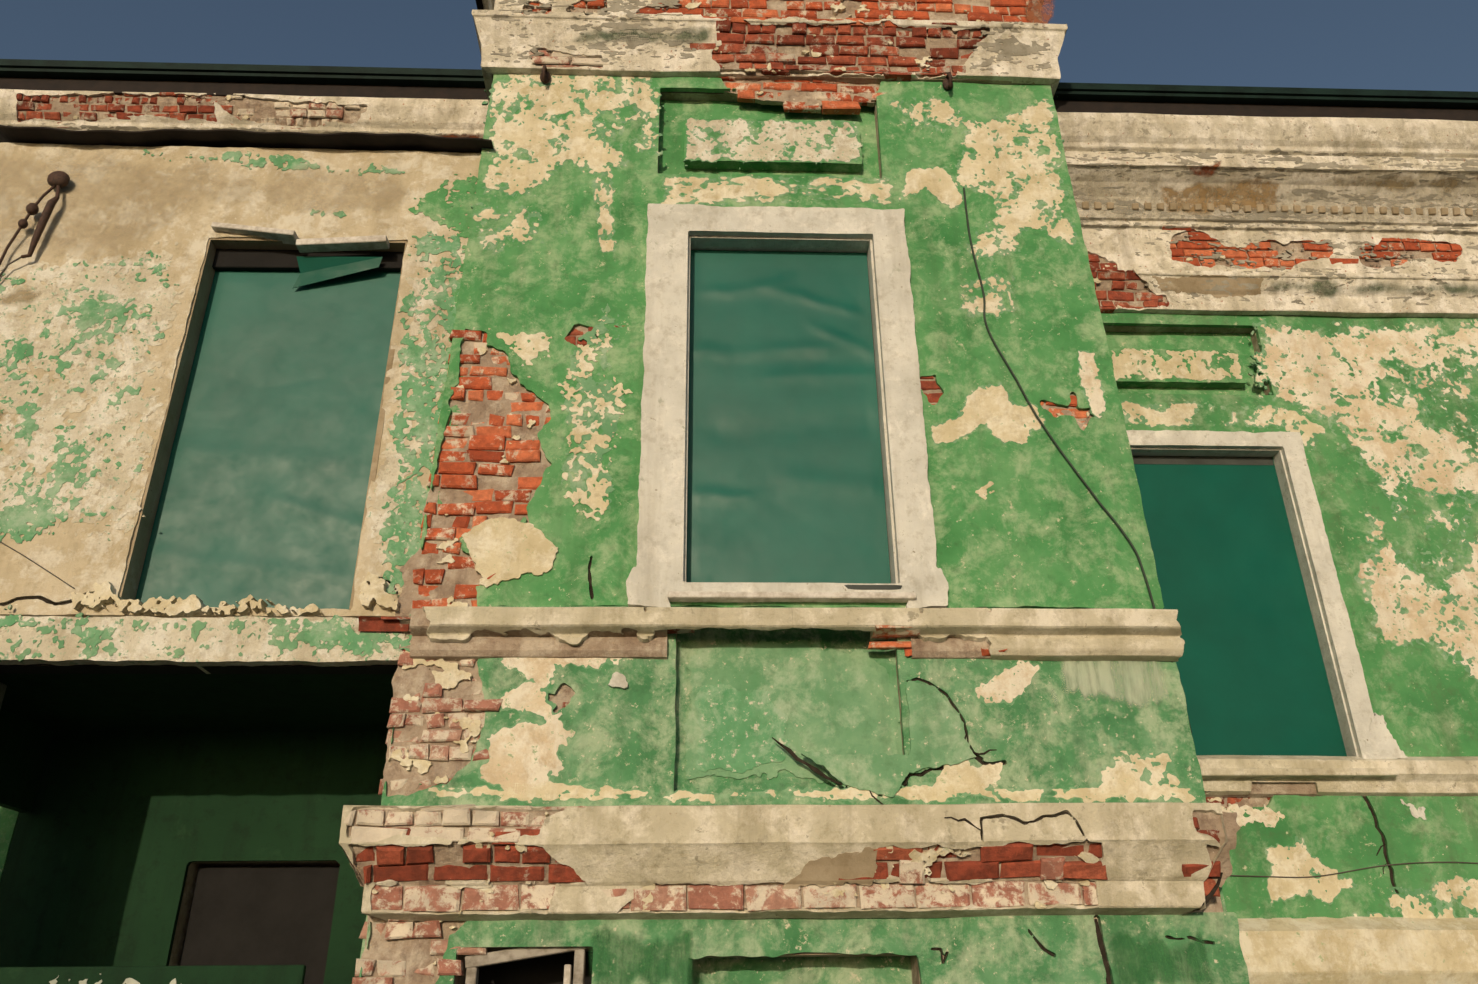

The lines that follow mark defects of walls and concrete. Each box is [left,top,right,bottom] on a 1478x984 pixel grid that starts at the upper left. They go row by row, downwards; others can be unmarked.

flaking render [491,0,1478,313]
peeling [1112,317,1478,691]
crack [0,592,94,606]
crack [772,679,1004,805]
spalling [1363,713,1408,759]
crack [944,812,1087,840]
flaking render [1193,817,1220,843]
flaking render [1206,797,1285,828]
crack [1362,796,1398,894]
peeling [1400,799,1426,820]
flaking render [1182,861,1221,897]
flaking render [1262,836,1478,919]